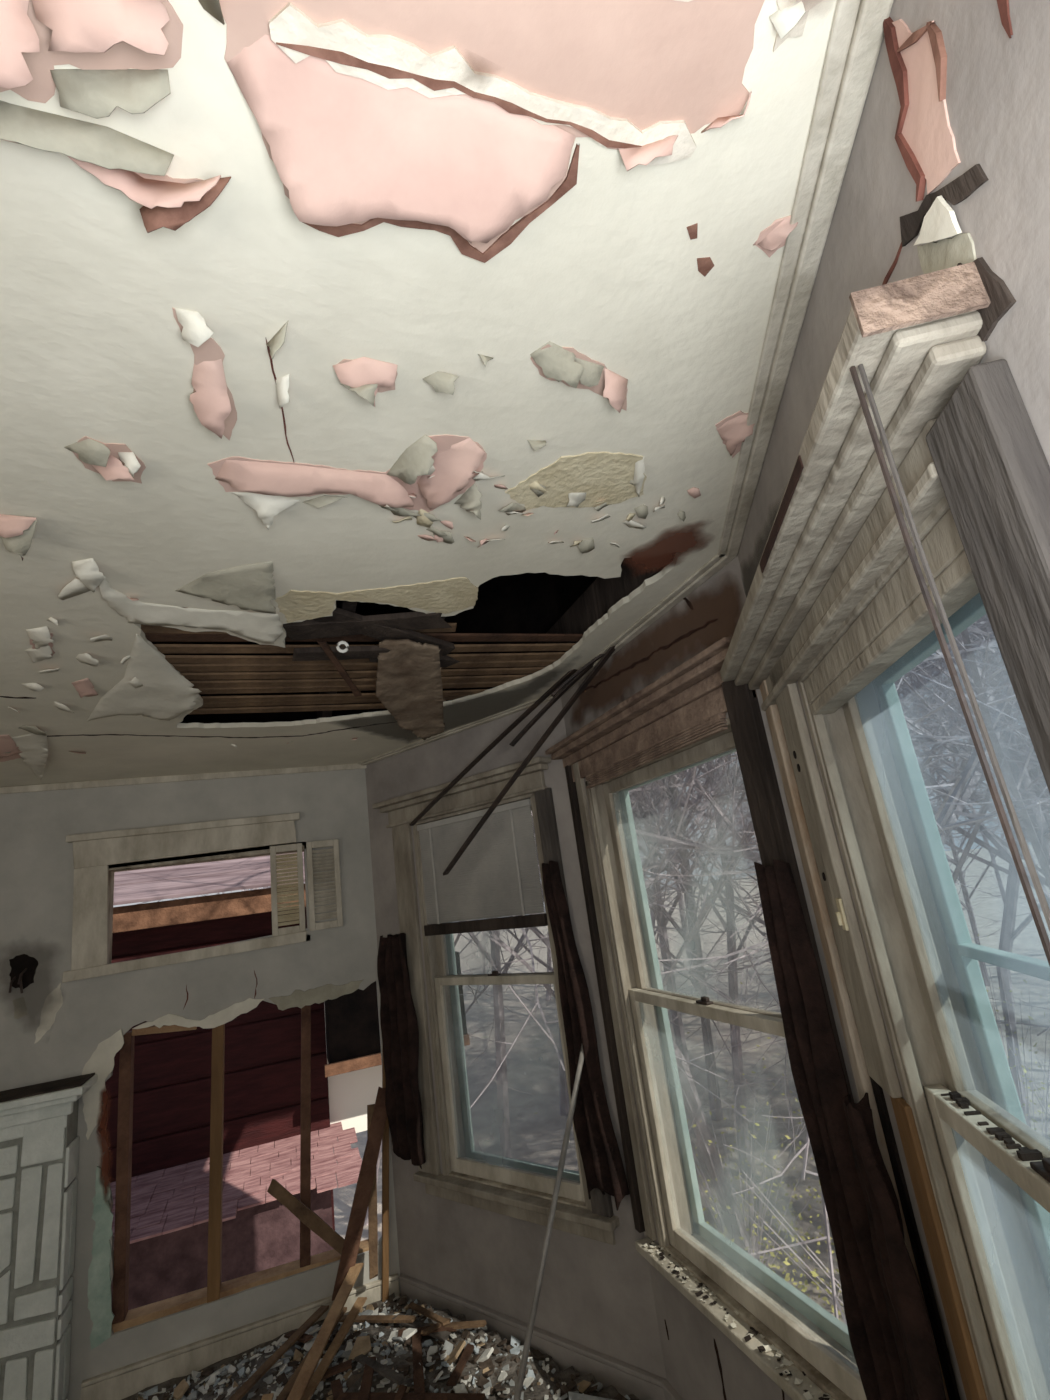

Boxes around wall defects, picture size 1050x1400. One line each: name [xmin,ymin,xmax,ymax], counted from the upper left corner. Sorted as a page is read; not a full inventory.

peeling [0,0,231,233]
peeling [198,0,823,263]
peeling [883,17,1016,342]
peeling [697,257,714,277]
peeling [172,307,237,440]
peeling [530,341,628,413]
peeling [207,434,701,553]
peeling [22,558,478,721]
damp [573,510,778,723]
flaking render [82,980,363,1140]
flaking render [87,1166,114,1349]
crack [714,1339,727,1400]